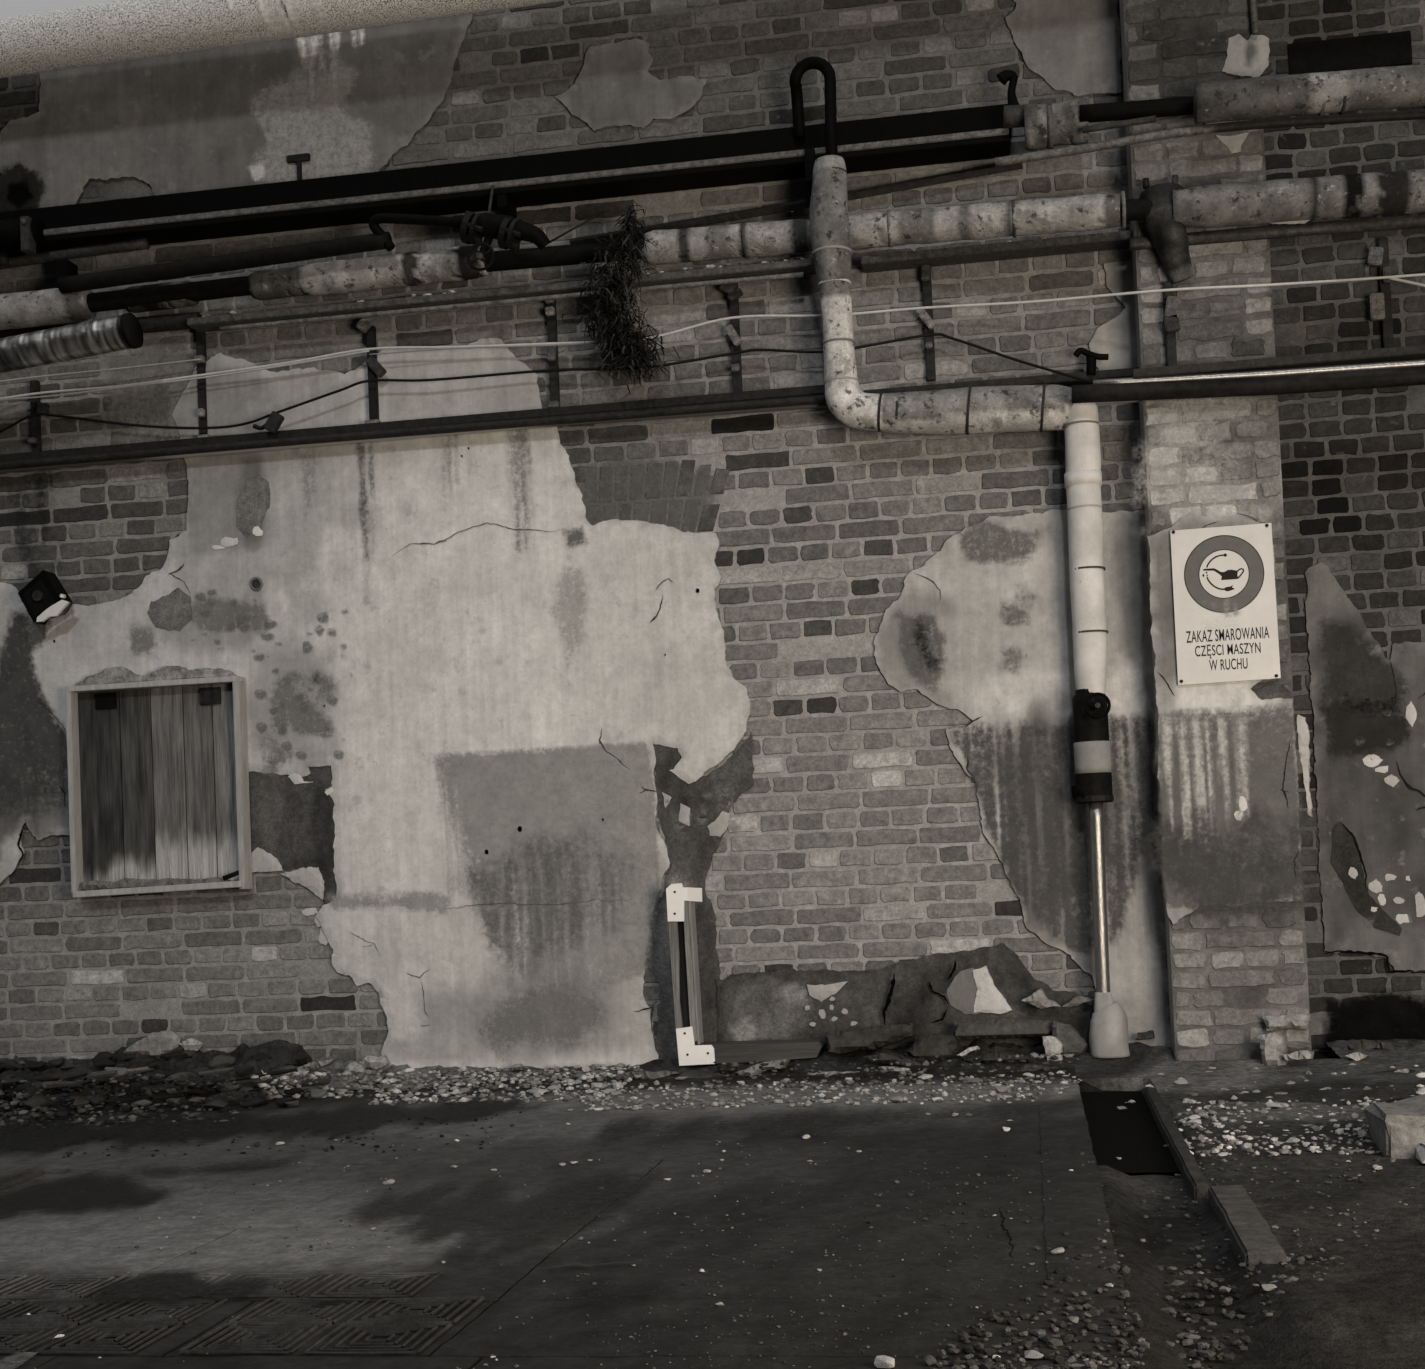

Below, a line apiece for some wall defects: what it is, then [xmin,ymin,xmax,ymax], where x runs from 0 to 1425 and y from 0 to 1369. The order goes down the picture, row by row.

flaking render [0,14,473,208]
flaking render [172,338,542,439]
crack [392,523,563,556]
damp [0,612,68,808]
flaking render [0,426,751,1069]
flaking render [874,508,1425,1051]
damp [1161,716,1249,849]
damp [330,780,622,1047]